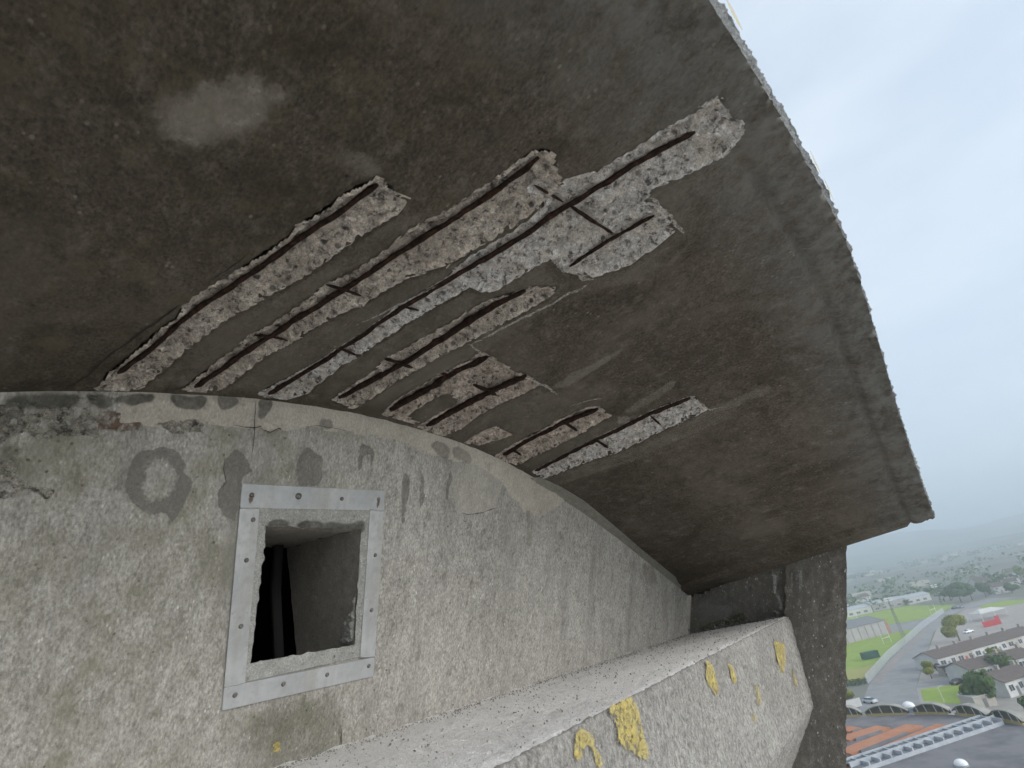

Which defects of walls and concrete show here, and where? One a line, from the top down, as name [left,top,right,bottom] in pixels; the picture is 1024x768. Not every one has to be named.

spalling [93,176,411,392]
spalling [182,96,745,409]
water stain [7,394,154,408]
water stain [171,395,206,409]
spalling [382,352,707,479]
water stain [125,447,192,521]
water stain [218,450,252,519]